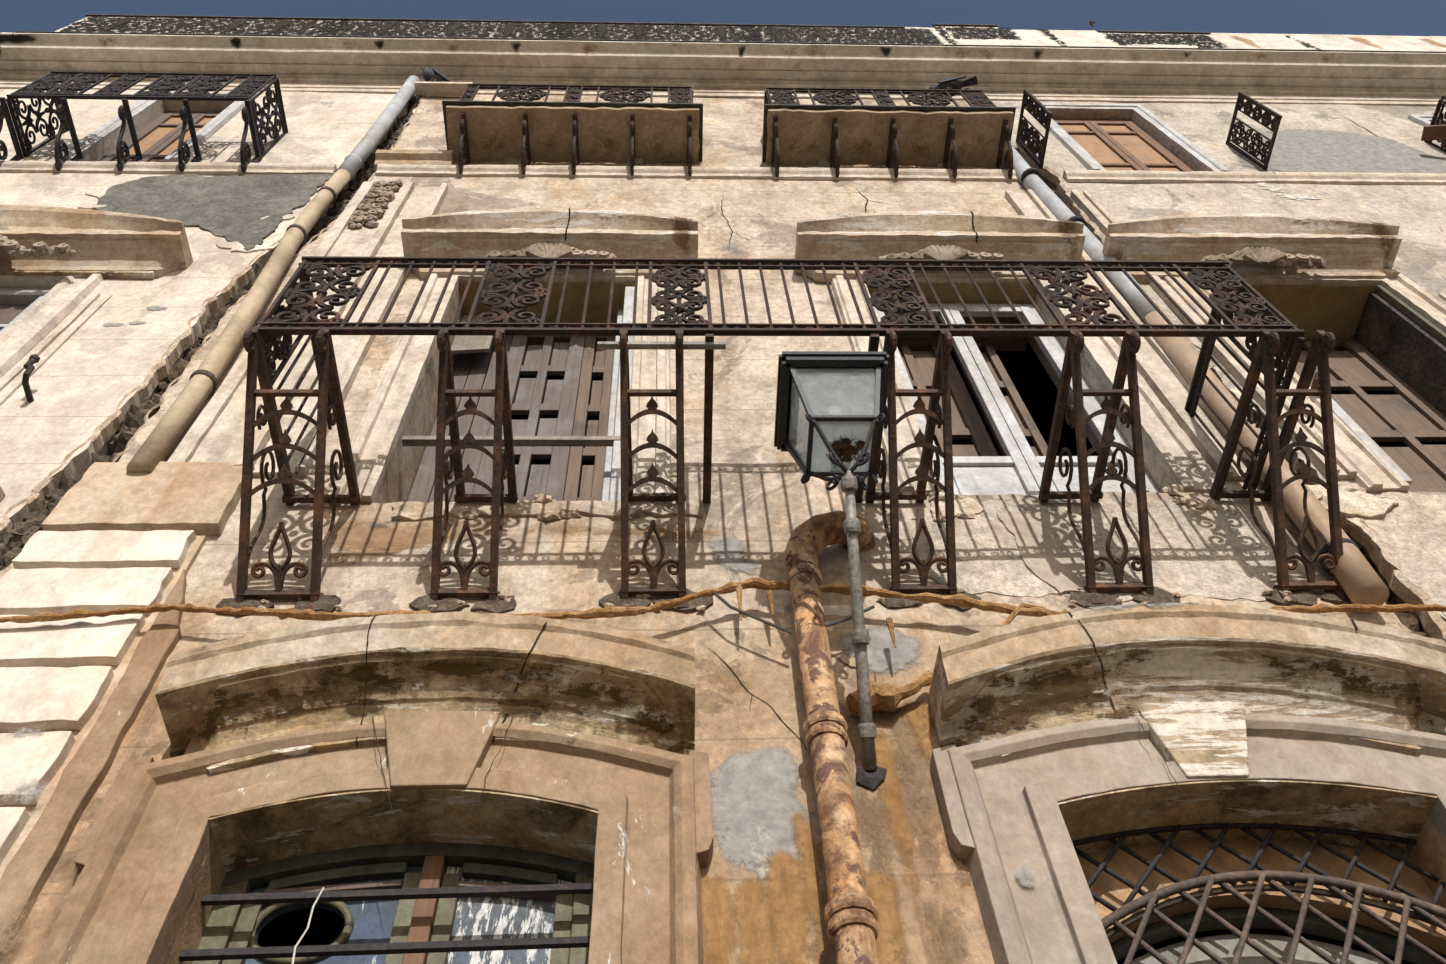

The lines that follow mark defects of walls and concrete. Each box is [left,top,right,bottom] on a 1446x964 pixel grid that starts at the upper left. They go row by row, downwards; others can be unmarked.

crack [1348,517,1446,642]
crack [356,615,394,827]
damp [197,656,676,742]
crack [467,622,564,818]
crack [1066,612,1197,814]
damp [1260,654,1434,725]
rust [855,702,935,964]